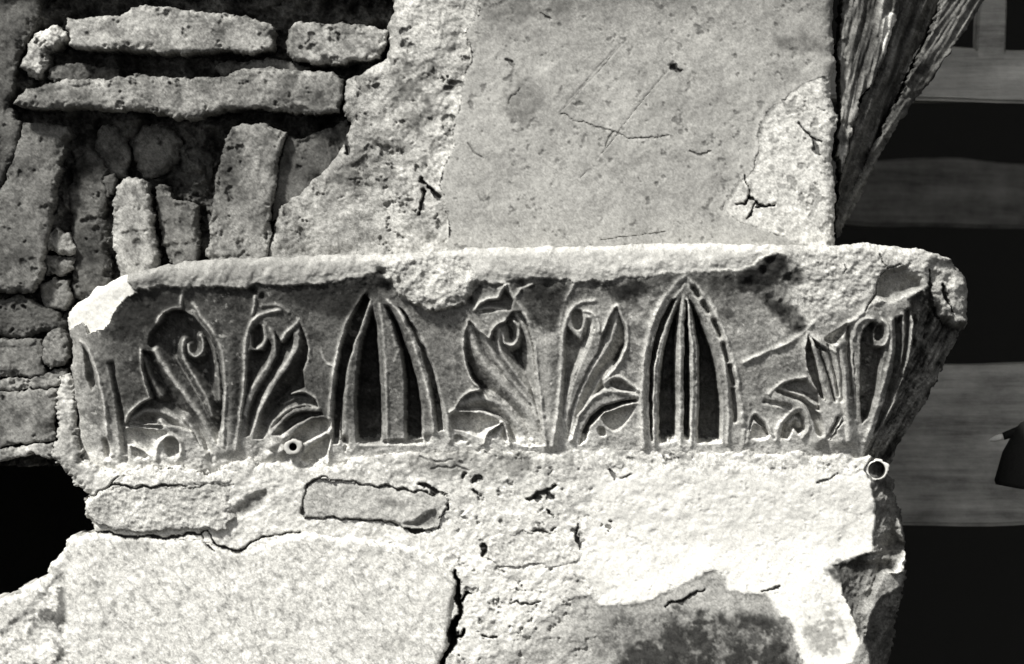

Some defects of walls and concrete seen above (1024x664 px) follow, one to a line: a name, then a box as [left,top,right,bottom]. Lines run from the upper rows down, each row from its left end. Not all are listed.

peeling [268,0,481,312]
crack [736,175,776,220]
crack [798,122,823,156]
peeling [720,75,968,337]
spalling [68,275,138,334]
crack [440,570,472,664]